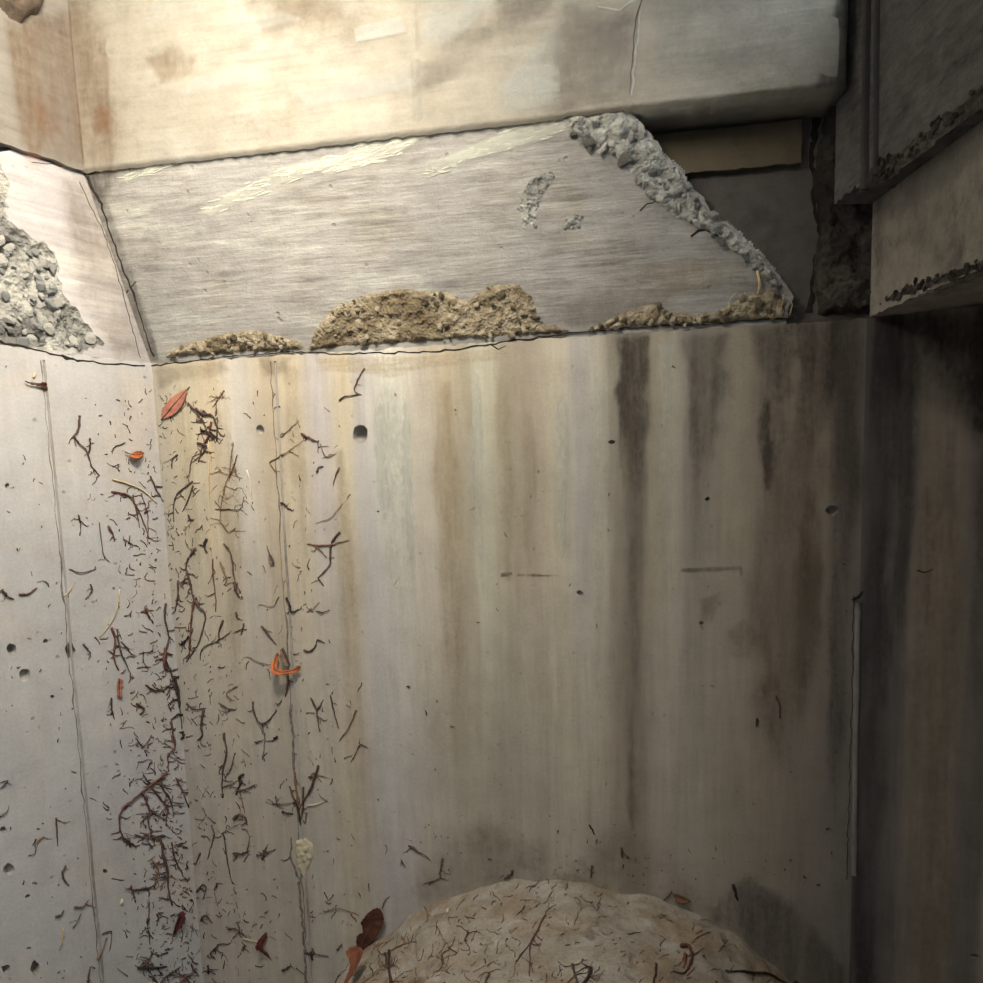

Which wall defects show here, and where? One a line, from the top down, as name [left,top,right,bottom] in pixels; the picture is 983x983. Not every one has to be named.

crack [629,0,642,91]
spalling [858,85,983,194]
spalling [0,161,104,355]
peeling [517,170,555,230]
spalling [563,110,789,332]
spalling [879,259,983,305]
leakage [617,337,648,419]